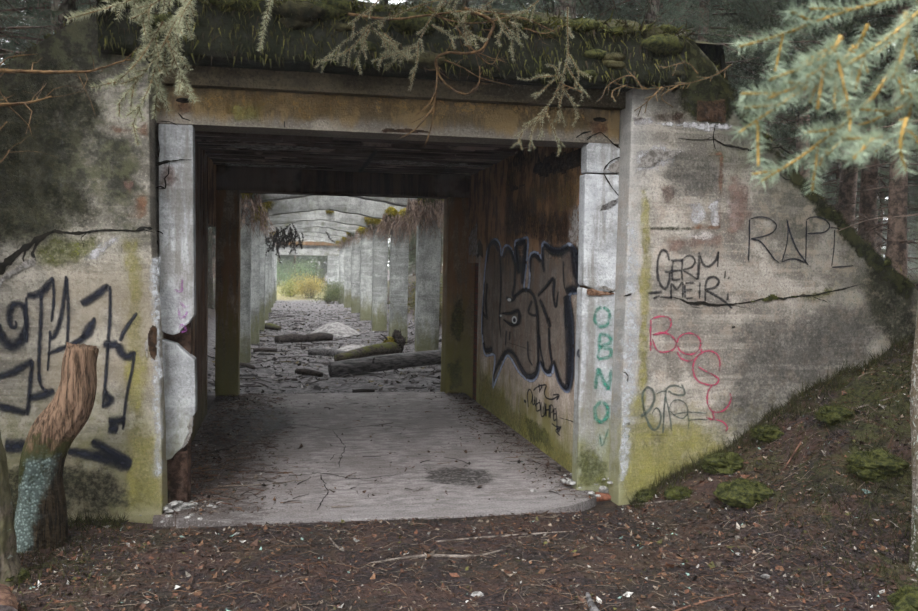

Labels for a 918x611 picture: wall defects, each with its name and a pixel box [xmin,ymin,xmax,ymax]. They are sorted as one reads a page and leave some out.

crack [678,125,803,180]
crack [0,226,163,275]
crack [672,283,867,309]
water stain [151,258,161,433]
water stain [620,223,639,475]